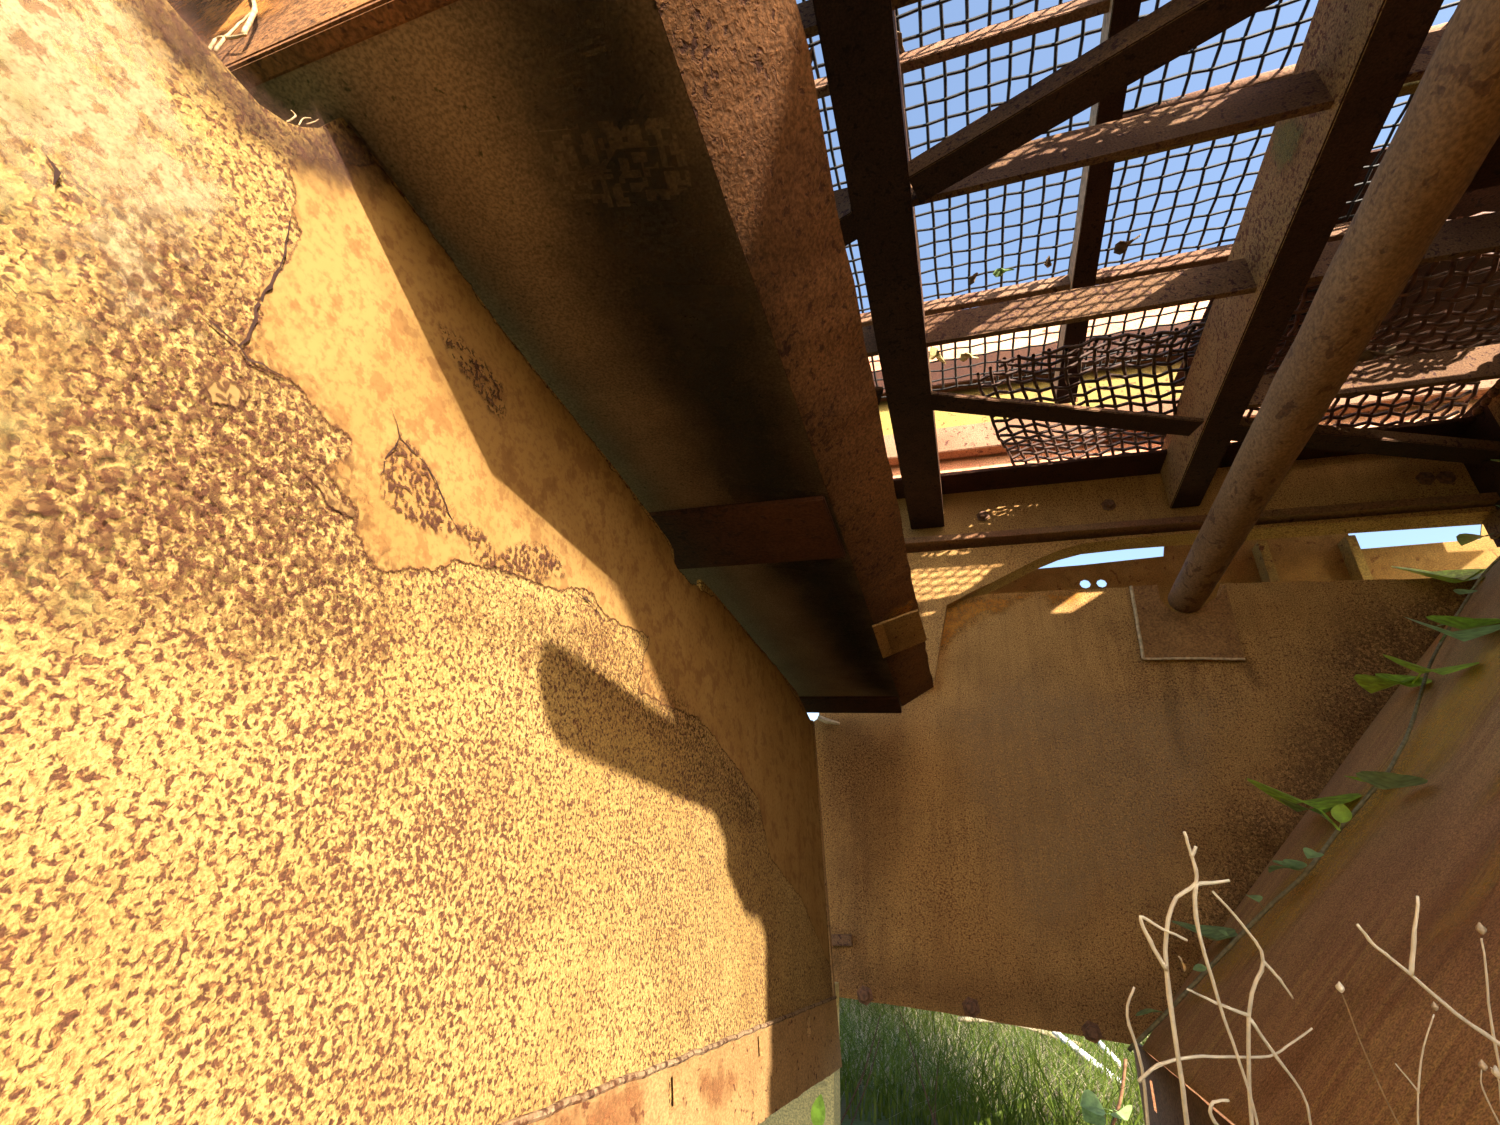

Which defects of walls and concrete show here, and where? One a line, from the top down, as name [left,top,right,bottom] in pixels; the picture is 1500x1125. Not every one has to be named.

rust [3,0,830,966]
rust [941,591,1079,649]